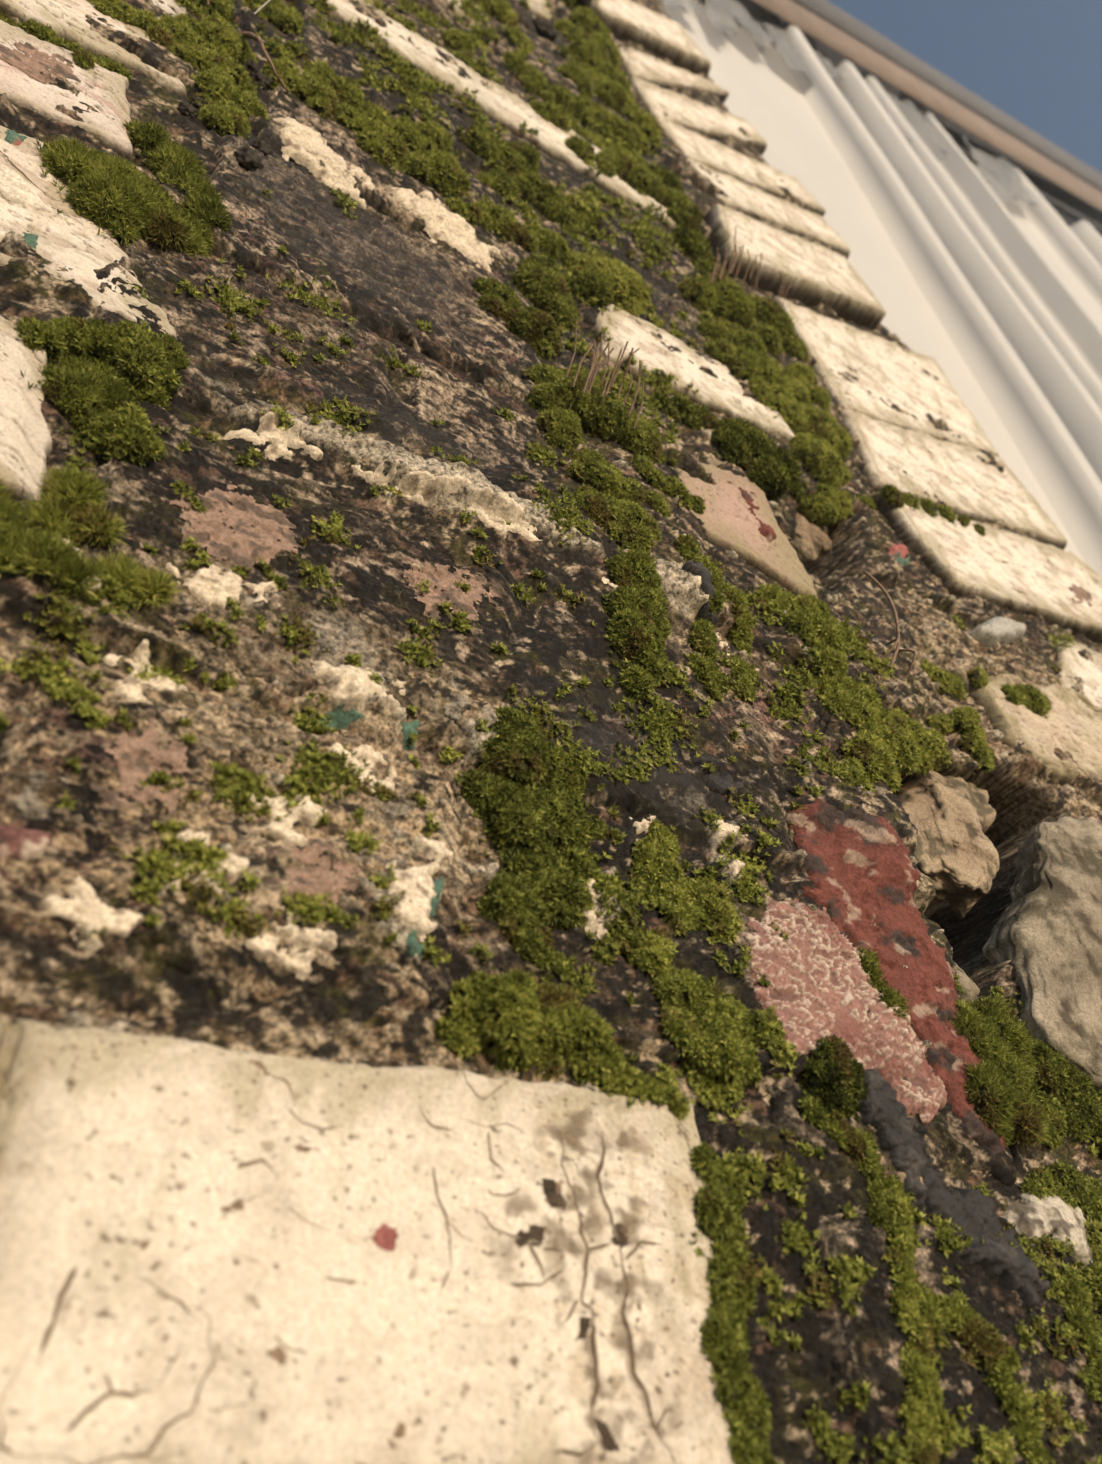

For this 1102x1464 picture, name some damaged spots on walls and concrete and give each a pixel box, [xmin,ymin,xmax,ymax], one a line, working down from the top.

peeling [0,42,81,84]
peeling [4,129,27,146]
peeling [0,163,76,226]
peeling [23,232,39,249]
crack [270,1074,342,1131]
crack [219,1158,330,1231]
crack [326,1276,356,1284]
crack [347,1053,676,1464]
crack [0,1276,257,1464]